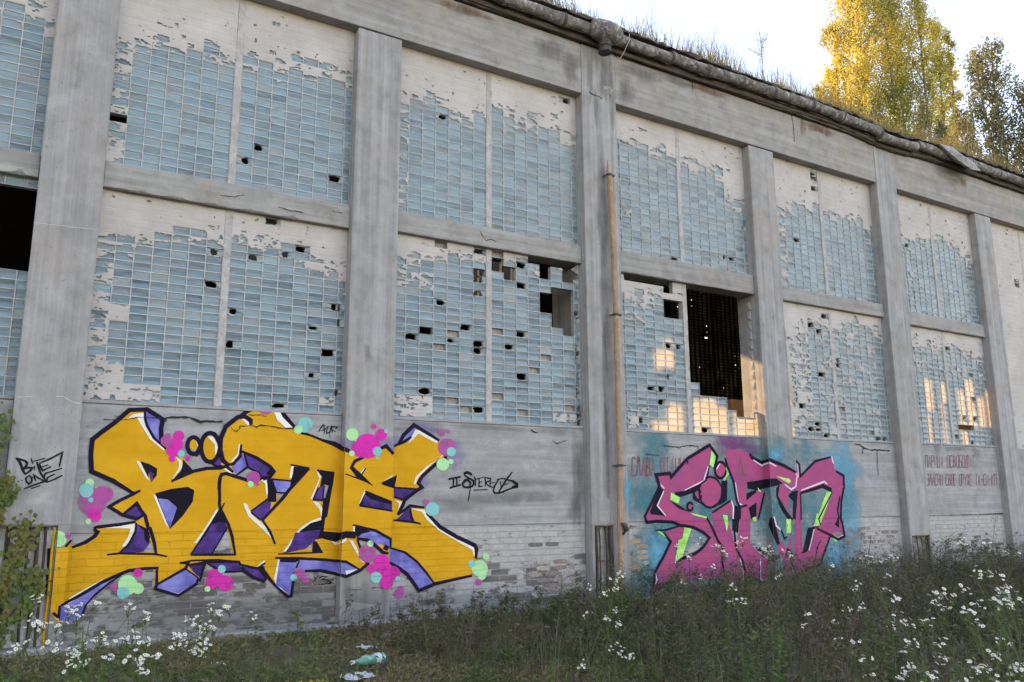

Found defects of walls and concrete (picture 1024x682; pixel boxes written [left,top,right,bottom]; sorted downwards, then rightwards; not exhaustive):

peeling [105,0,355,161]
peeling [398,46,576,206]
peeling [616,110,745,213]
peeling [83,188,348,402]
peeling [394,394,433,417]
peeling [397,234,486,290]
peeling [504,252,540,276]
peeling [621,271,696,323]
peeling [773,157,873,287]
peeling [783,301,883,436]
peeling [897,194,973,306]
peeling [910,324,987,381]